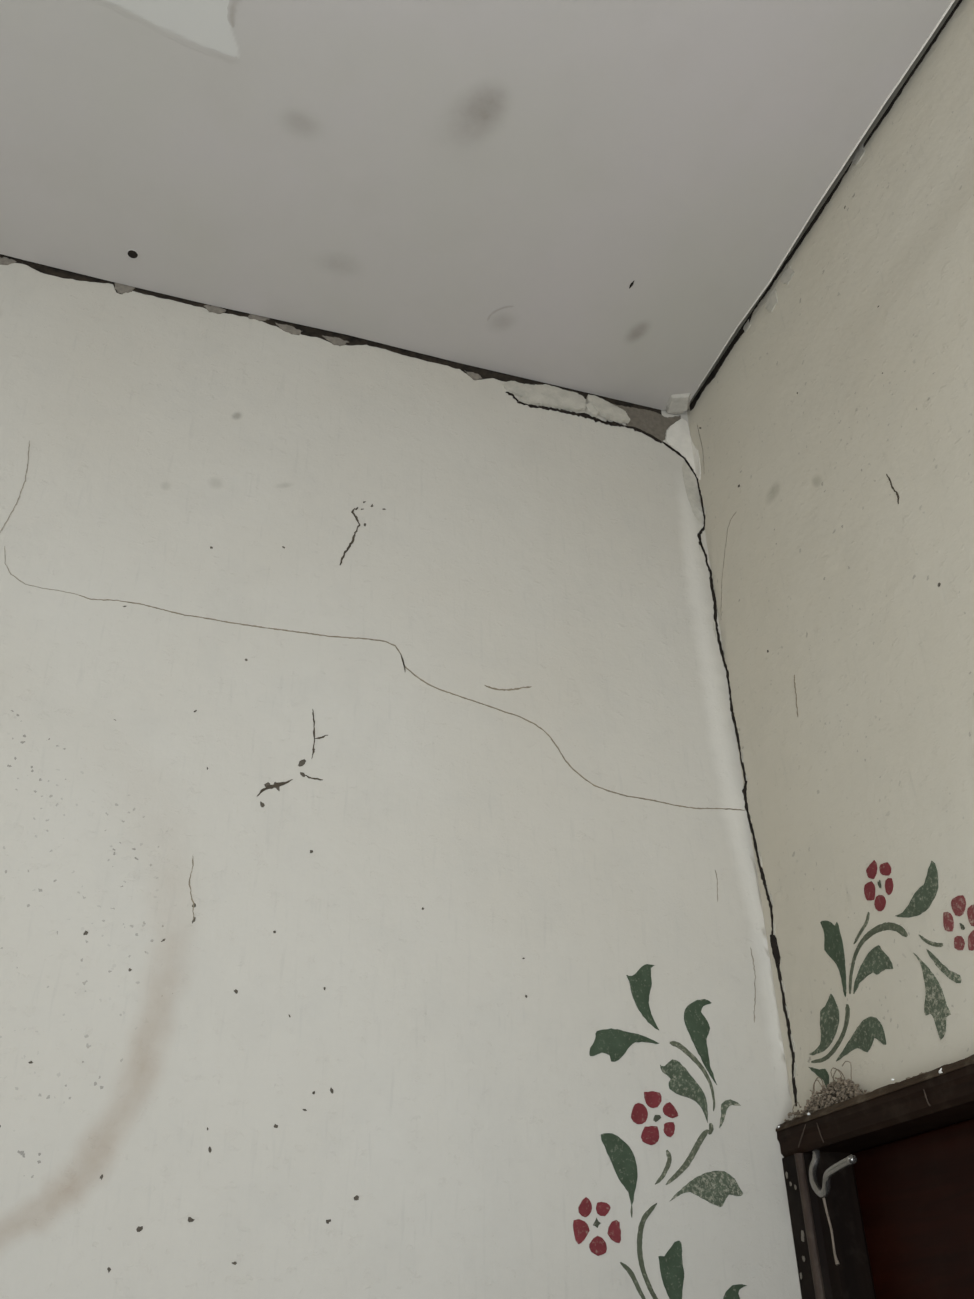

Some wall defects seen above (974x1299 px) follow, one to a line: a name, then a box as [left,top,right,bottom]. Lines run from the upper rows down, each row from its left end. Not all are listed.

peeling [90,0,242,64]
crack [690,0,962,411]
leakage [0,710,208,1266]
crack [0,254,797,1106]
peeling [503,381,791,1112]
crack [886,474,899,504]